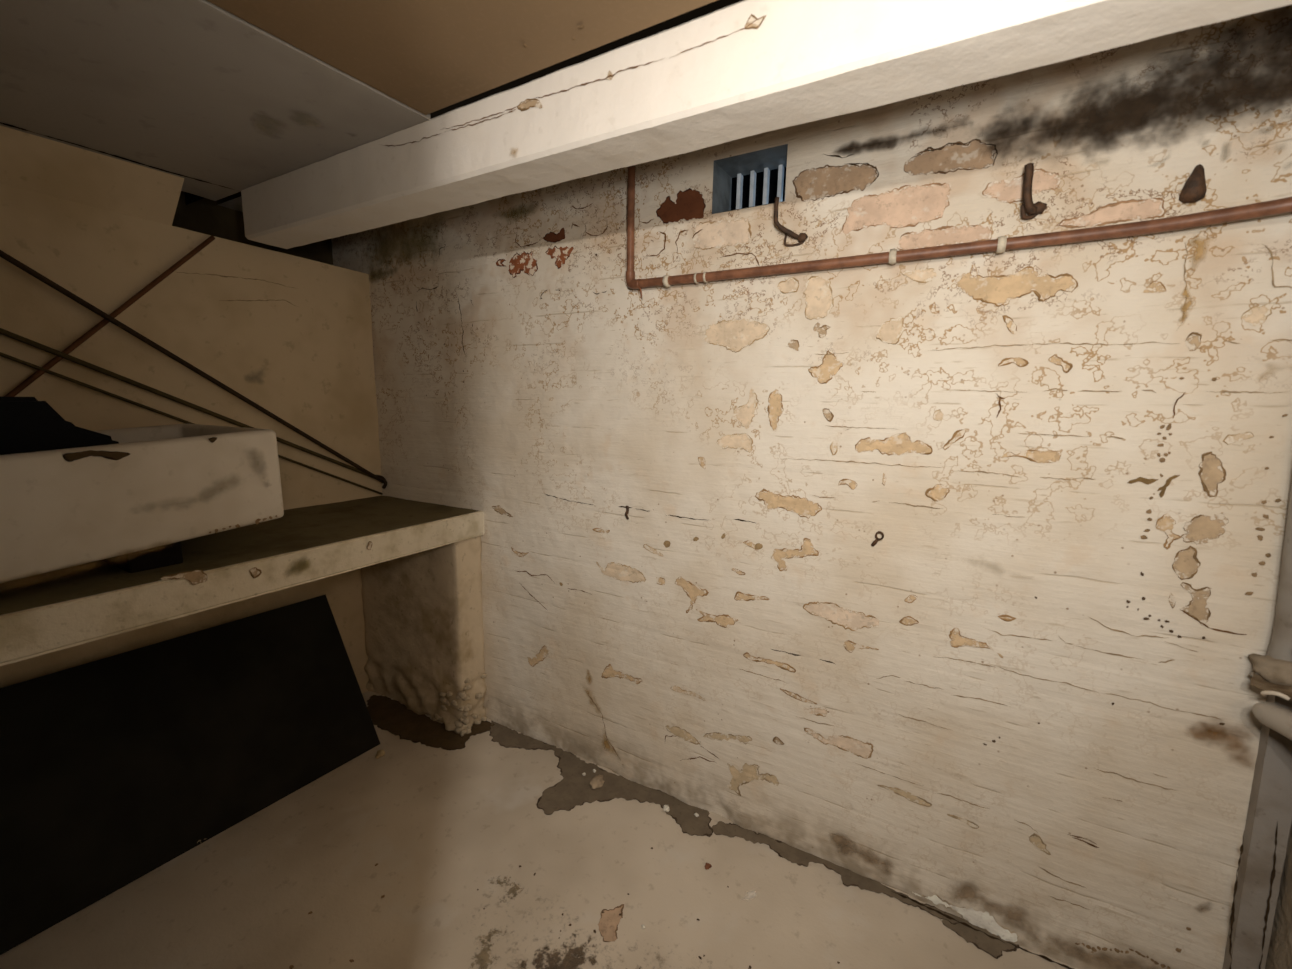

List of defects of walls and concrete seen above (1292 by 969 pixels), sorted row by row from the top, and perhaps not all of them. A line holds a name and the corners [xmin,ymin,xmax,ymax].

flaking render [656,139,1061,250]
flaking render [1056,198,1166,229]
spalling [496,228,574,278]
peeling [955,266,1078,334]
peeling [855,429,967,485]
peeling [1198,432,1254,497]
peeling [755,488,822,519]
peeling [1126,512,1229,639]
damp [832,835,888,871]
damp [955,885,1033,934]
damp [521,947,548,968]
damp [1068,943,1170,969]